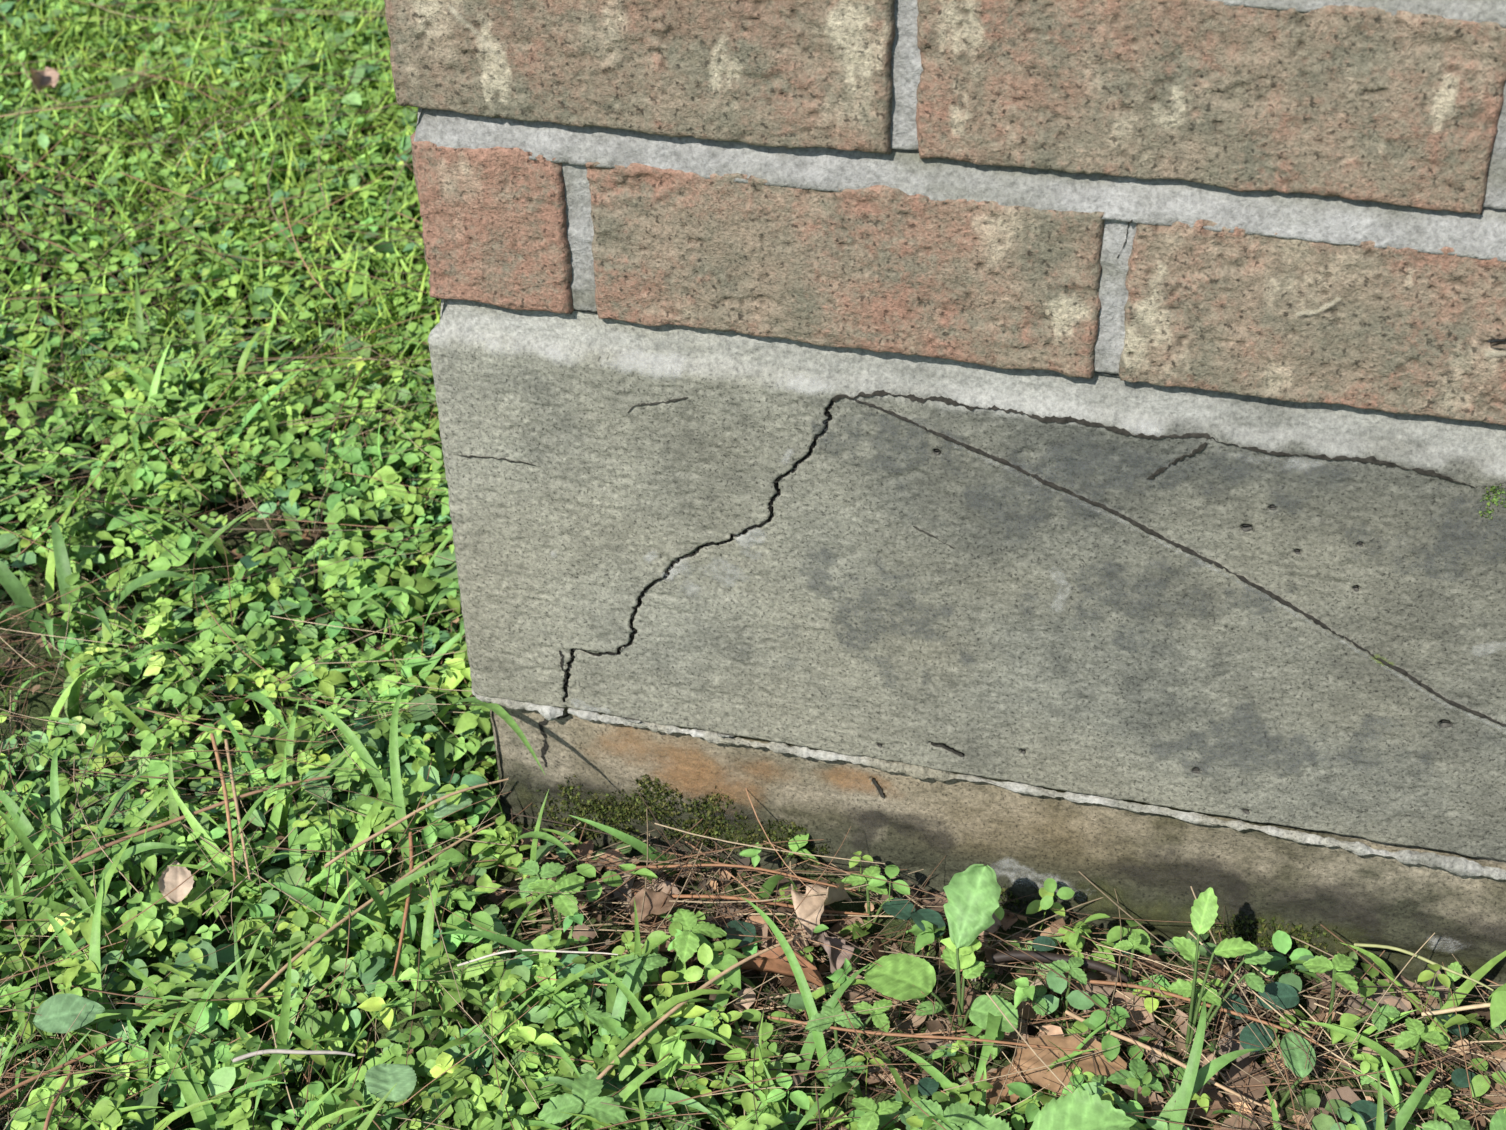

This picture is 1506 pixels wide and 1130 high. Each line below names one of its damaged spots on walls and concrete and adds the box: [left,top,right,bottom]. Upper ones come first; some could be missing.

crack [538,390,1506,767]